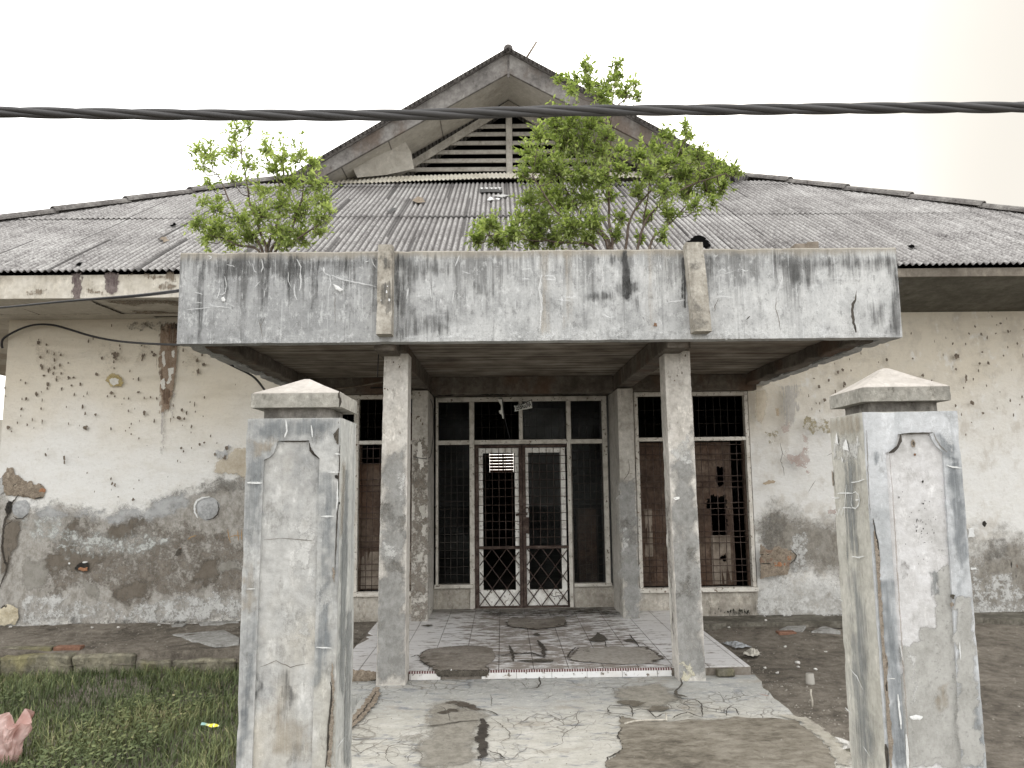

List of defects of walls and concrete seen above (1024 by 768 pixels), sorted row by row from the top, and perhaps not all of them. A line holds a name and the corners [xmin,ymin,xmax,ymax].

damp [287,255,399,304]
damp [590,251,639,306]
damp [663,257,748,311]
crack [850,290,858,333]
damp [866,258,900,336]
spalling [0,467,46,499]
damp [0,422,280,626]
damp [715,384,860,617]
spalling [759,544,797,579]
damp [944,442,1024,768]
crack [385,695,510,766]
crack [603,678,739,742]